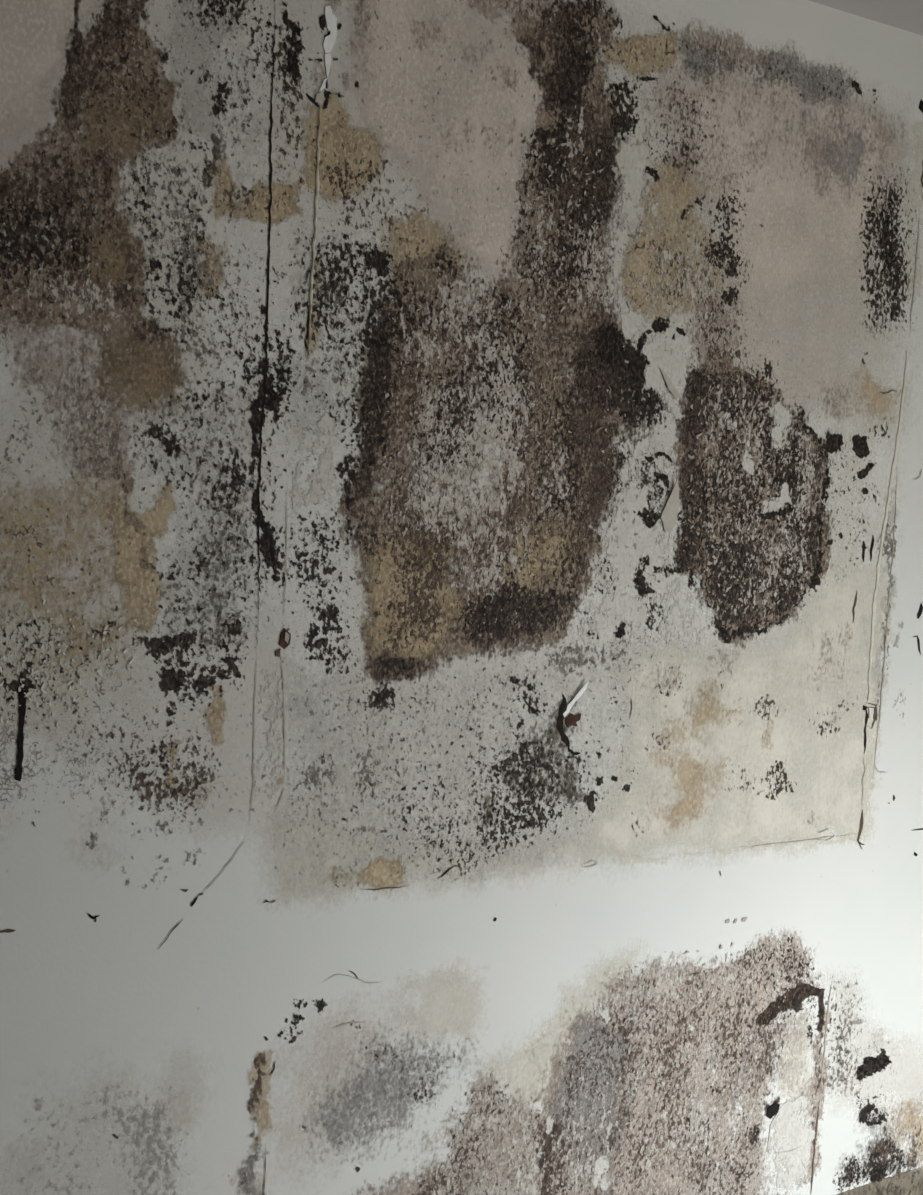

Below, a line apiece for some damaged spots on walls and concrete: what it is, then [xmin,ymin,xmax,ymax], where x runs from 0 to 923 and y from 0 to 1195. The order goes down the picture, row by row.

crack [158,16,276,950]
crack [303,309,311,359]
damp [0,0,922,894]
damp [264,972,477,1148]
damp [357,930,923,1195]